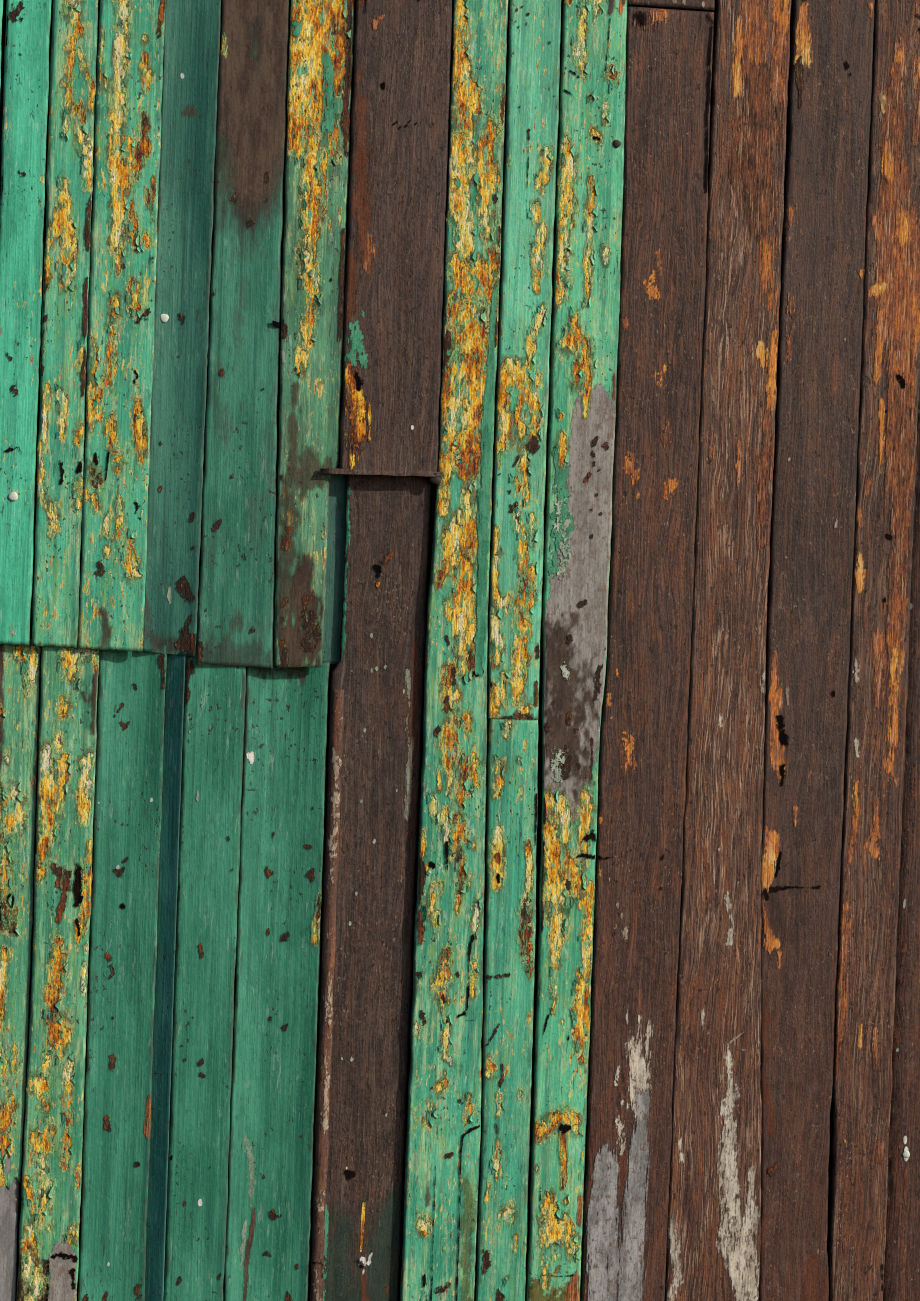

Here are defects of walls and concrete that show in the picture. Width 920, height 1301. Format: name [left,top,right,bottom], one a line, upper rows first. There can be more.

peeling [37,0,157,559]
peeling [272,0,353,380]
peeling [564,0,626,145]
peeling [9,625,41,699]
peeling [0,643,99,922]
peeling [412,0,616,1072]
peeling [0,862,92,1301]
peeling [484,1051,506,1119]
peeling [484,1135,518,1226]
peeling [534,1010,654,1301]
peeling [666,1216,684,1301]
peeling [715,1045,760,1301]